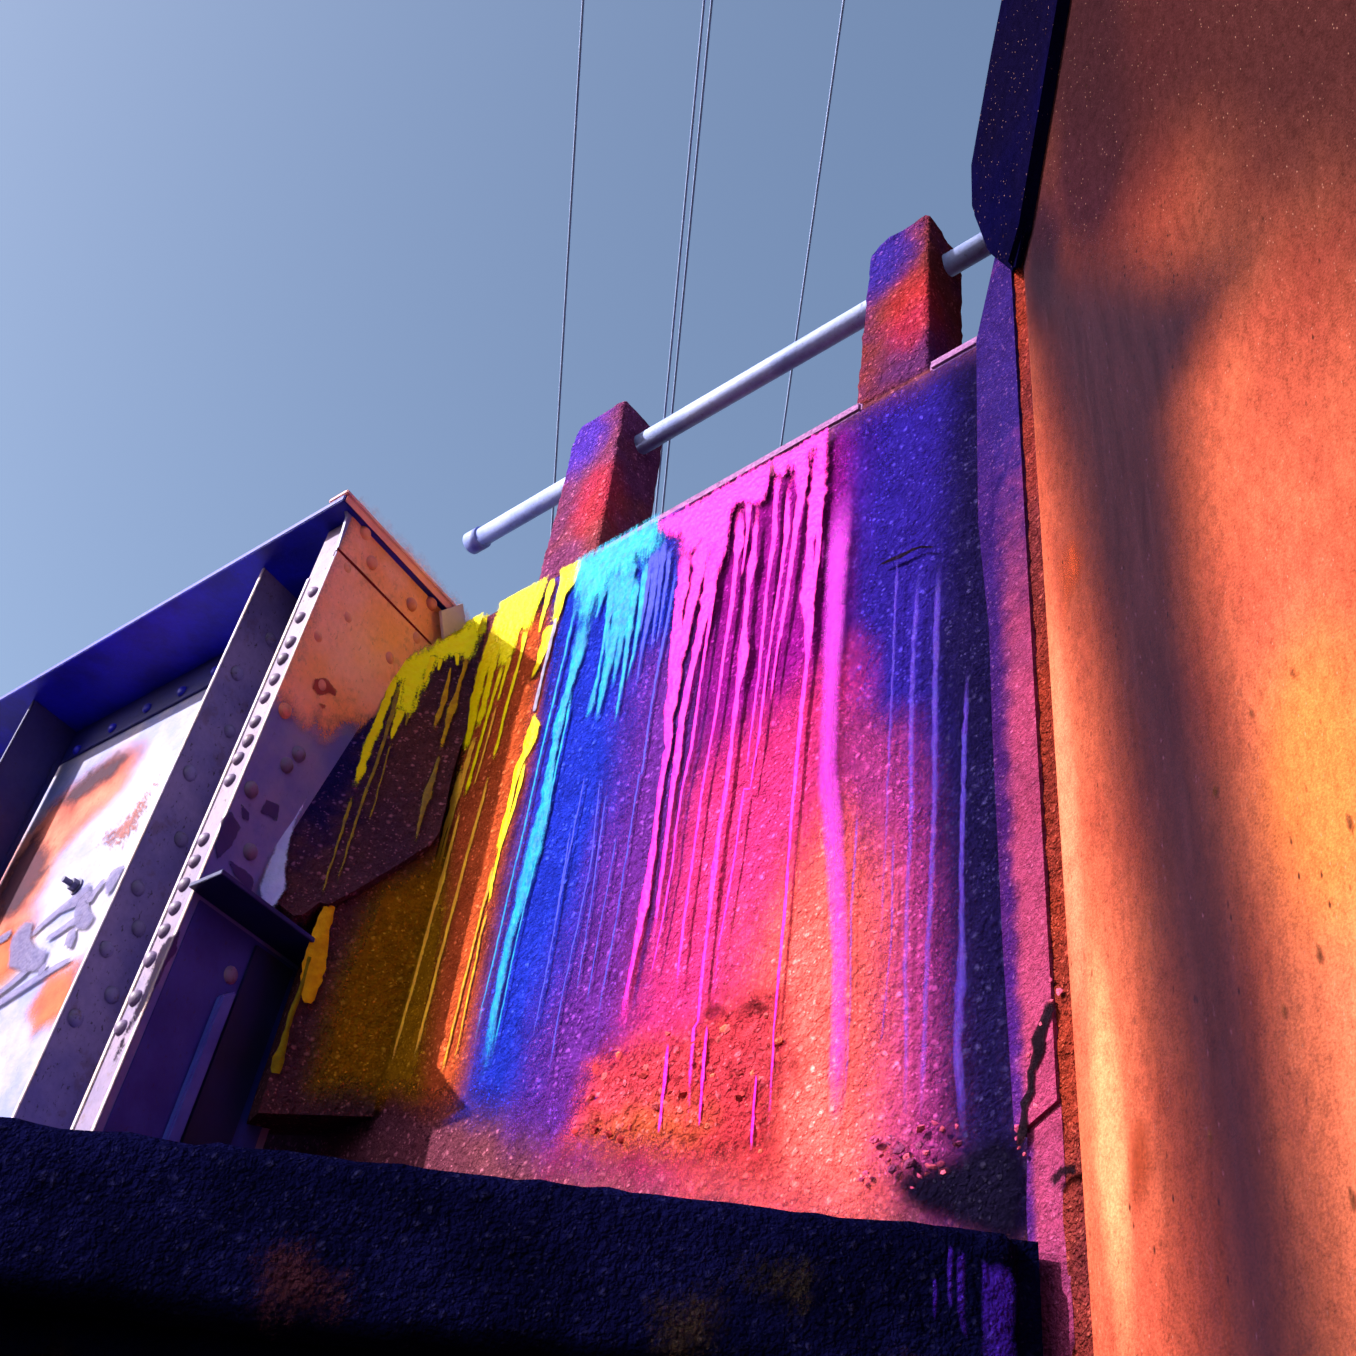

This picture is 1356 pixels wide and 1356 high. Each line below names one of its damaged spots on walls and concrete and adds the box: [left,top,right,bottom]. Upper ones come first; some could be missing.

rust [313,678,337,708]
rust [96,778,159,850]
rust [0,750,139,986]
rust [28,962,80,1032]
crack [1014,978,1063,1156]